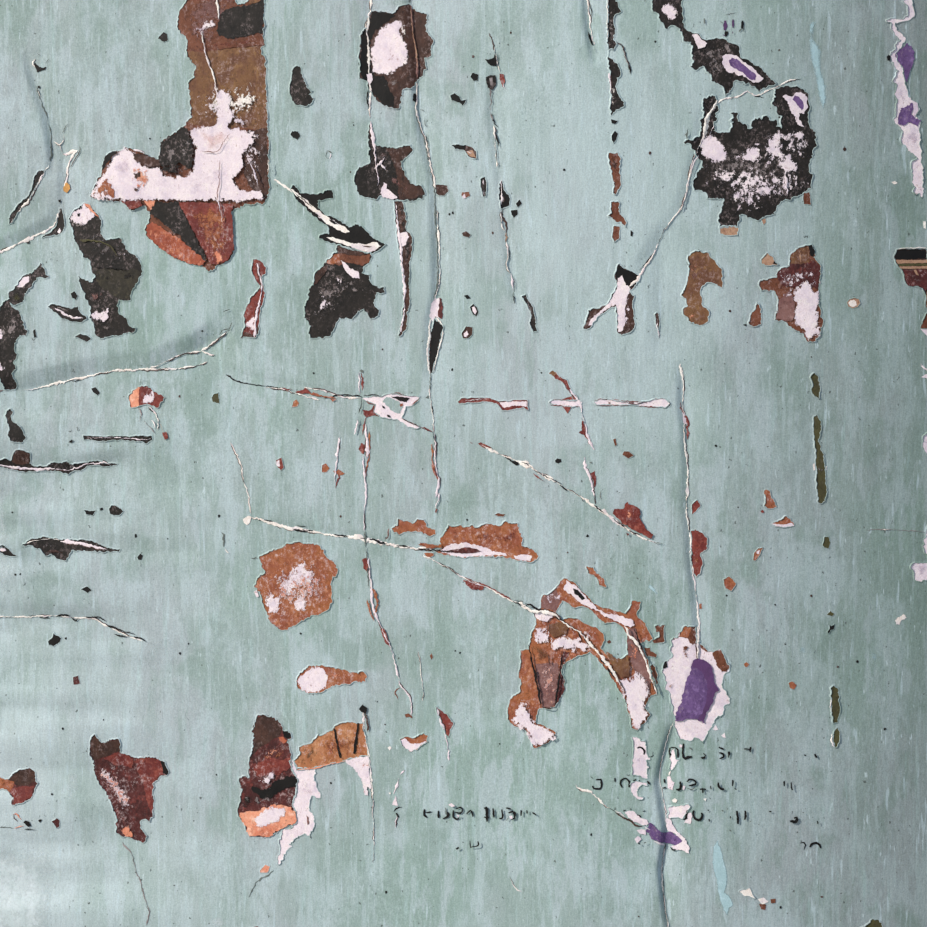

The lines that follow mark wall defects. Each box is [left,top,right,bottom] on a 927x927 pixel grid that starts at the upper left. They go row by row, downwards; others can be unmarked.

peeling [68,0,272,343]
peeling [357,3,435,110]
peeling [353,122,450,203]
peeling [651,0,818,237]
crack [29,309,232,390]
peeling [303,244,386,340]
crack [274,83,445,512]
crack [227,369,517,718]
crack [457,364,701,651]
peeling [506,577,731,749]
peeling [88,733,170,844]
peeling [236,705,371,839]